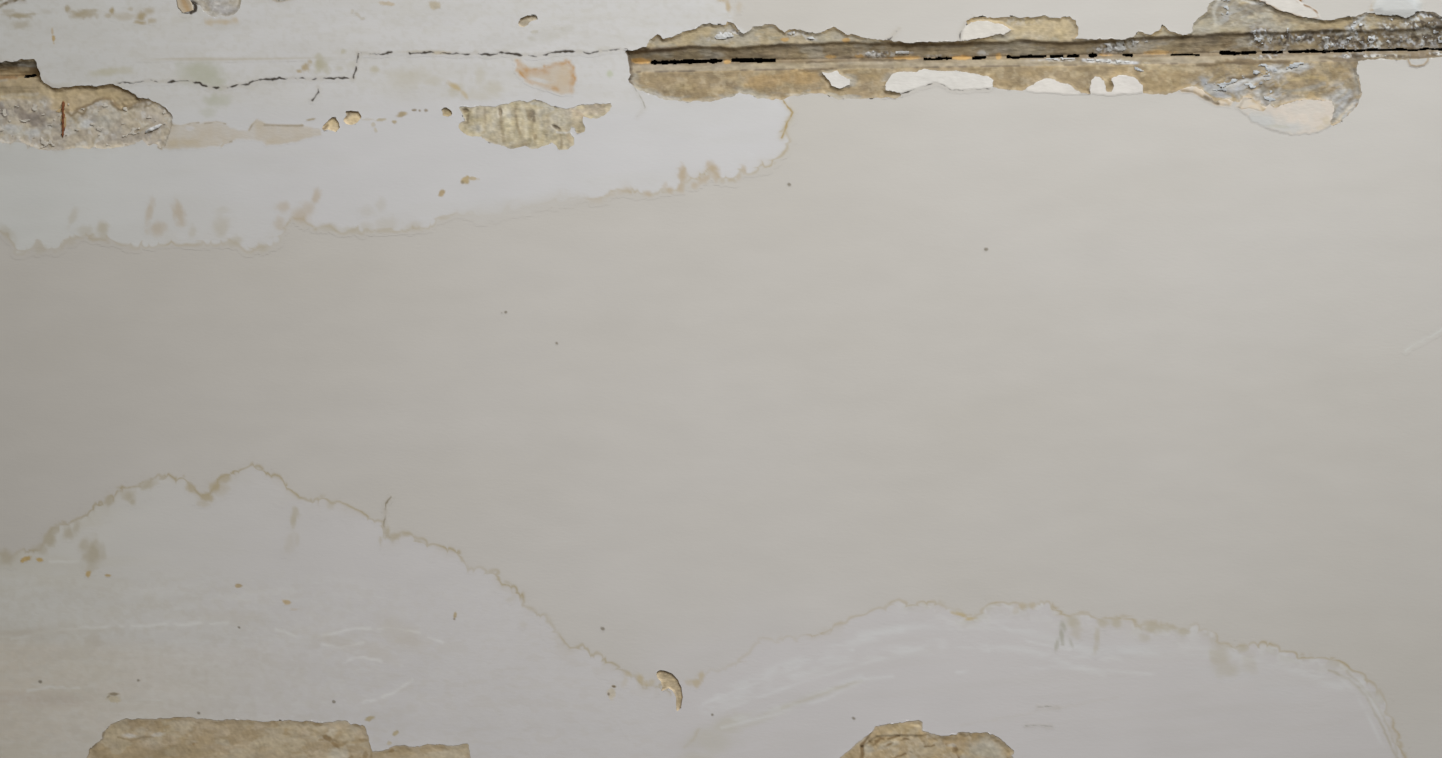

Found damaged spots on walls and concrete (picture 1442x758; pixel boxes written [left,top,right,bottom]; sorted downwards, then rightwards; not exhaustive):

flaking render [176,0,242,29]
flaking render [518,15,538,27]
crack [884,25,903,41]
crack [114,45,649,121]
flaking render [625,0,1442,136]
flaking render [0,59,612,152]
flaking render [437,174,481,198]
flaking render [656,670,683,711]
flaking render [87,691,471,758]
flaking render [840,720,1014,758]